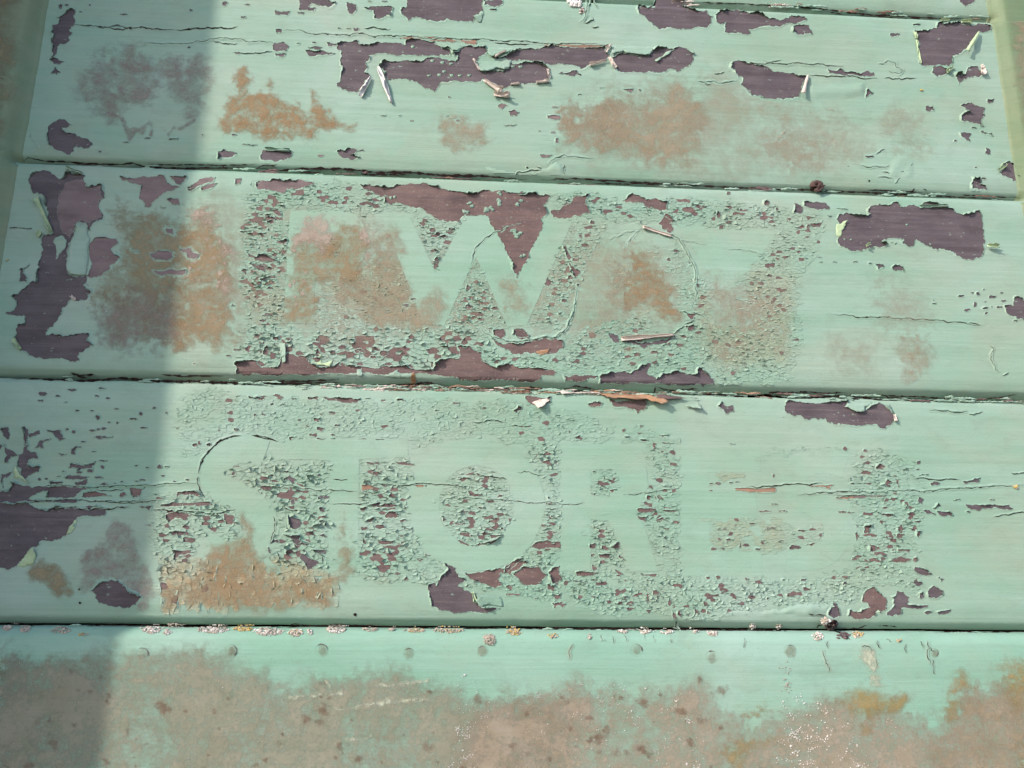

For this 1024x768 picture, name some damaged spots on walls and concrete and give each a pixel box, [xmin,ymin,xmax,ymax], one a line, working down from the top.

corrosion [221,67,342,138]
peeling [272,0,695,126]
spalling [538,106,561,158]
peeling [728,60,809,102]
peeling [911,0,992,85]
peeling [5,118,200,363]
corrosion [96,210,231,351]
peeling [0,173,1013,621]
corrosion [163,518,330,608]